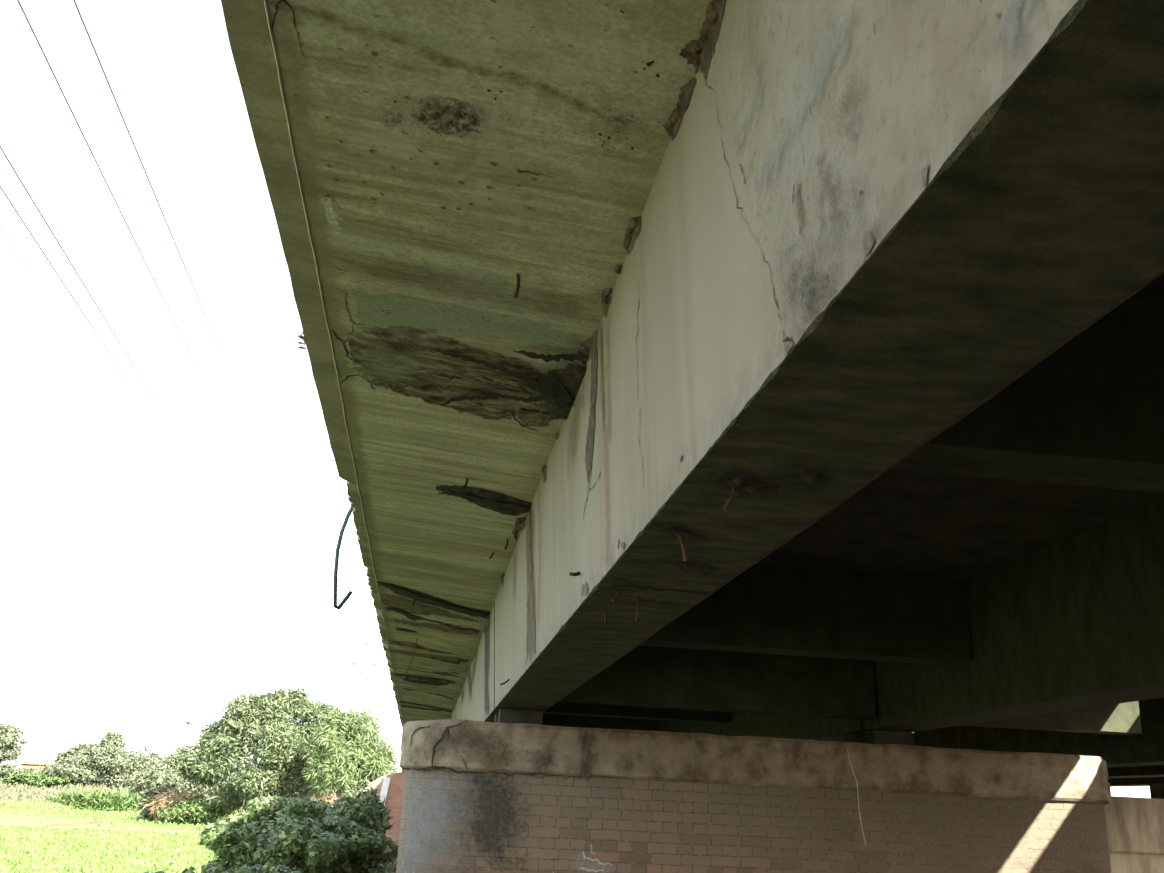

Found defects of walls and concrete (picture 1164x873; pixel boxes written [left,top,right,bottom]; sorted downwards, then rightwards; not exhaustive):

crack [271,0,305,57]
spalling [663,0,726,140]
spalling [614,216,641,274]
crack [703,73,785,347]
spalling [601,288,613,318]
spalling [348,325,598,482]
spalling [436,479,532,559]
spalling [377,581,491,712]
leakage [466,752,522,863]